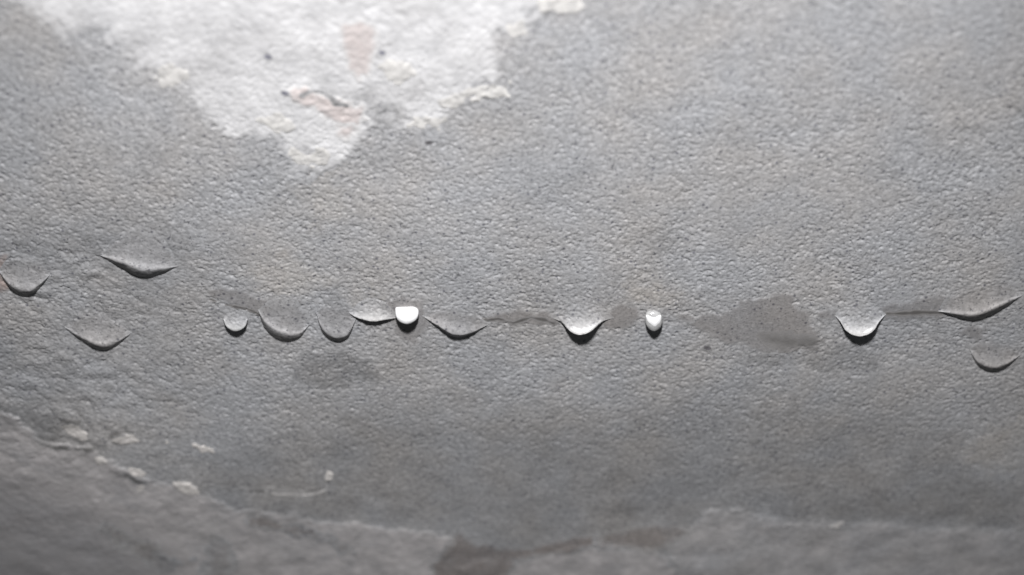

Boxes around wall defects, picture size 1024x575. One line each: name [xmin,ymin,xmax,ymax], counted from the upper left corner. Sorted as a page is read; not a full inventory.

peeling [1,0,584,185]
water stain [174,150,1024,575]